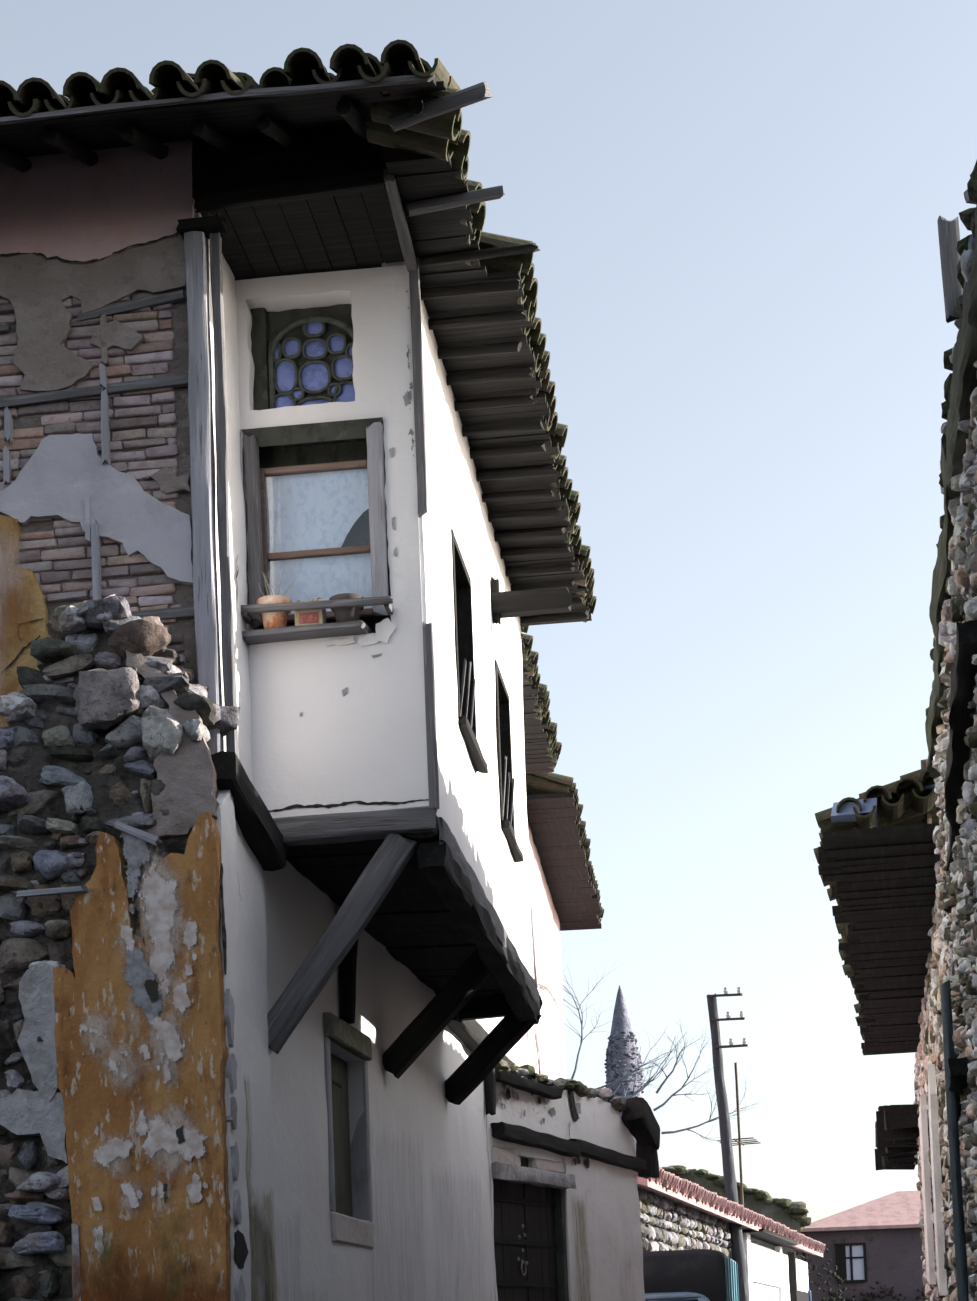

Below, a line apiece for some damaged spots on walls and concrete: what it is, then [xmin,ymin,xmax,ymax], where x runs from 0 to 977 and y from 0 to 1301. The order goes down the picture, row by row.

spalling [0,233,195,668]
flaking render [79,833,198,1088]
flaking render [91,1197,104,1257]
flaking render [92,1106,208,1208]
damp [245,1082,277,1301]